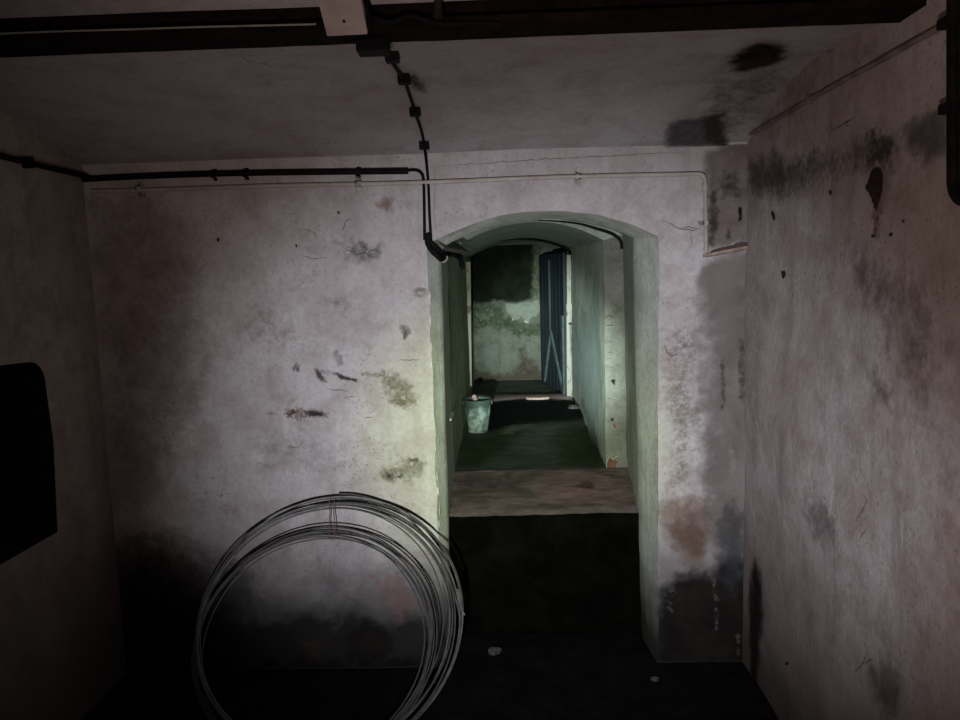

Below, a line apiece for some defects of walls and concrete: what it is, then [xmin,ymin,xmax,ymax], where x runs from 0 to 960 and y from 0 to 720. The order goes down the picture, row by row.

spalling [865,168,883,238]
water stain [387,377,412,405]
water stain [660,255,762,683]